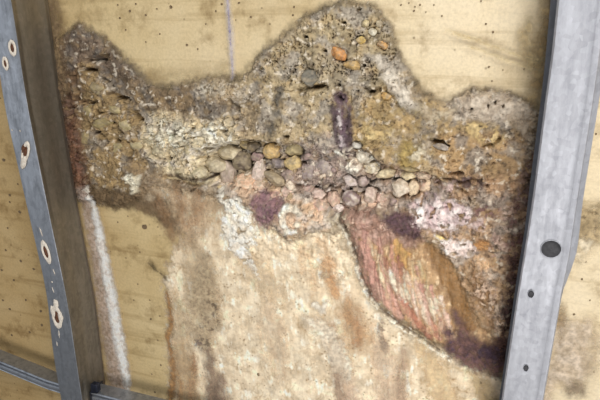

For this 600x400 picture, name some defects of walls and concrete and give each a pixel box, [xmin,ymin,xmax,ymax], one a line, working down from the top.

water stain [76,0,551,400]
rust [328,206,500,354]